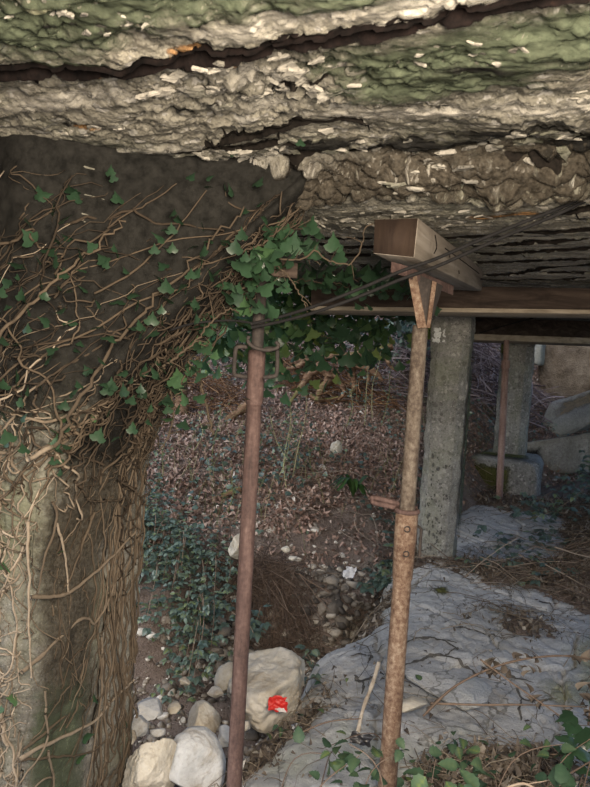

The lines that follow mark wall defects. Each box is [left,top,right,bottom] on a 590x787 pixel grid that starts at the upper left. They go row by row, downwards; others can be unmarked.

crack [0,0,590,84]
spalling [134,52,367,113]
crack [272,71,329,92]
crack [170,115,370,178]
spalling [192,128,393,163]
spalling [410,129,589,184]
spalling [377,181,430,196]
crack [434,204,590,282]
spalling [436,203,590,230]